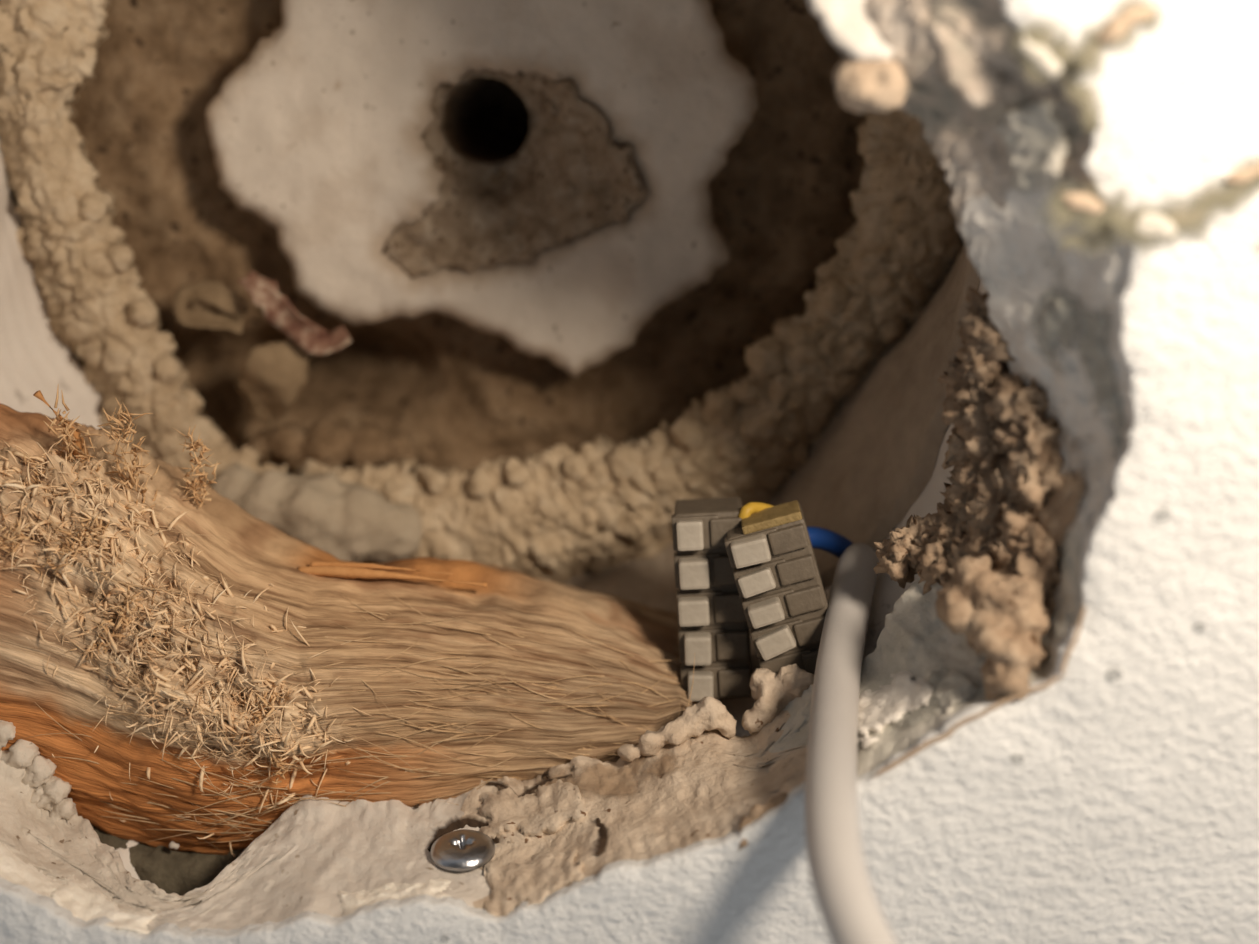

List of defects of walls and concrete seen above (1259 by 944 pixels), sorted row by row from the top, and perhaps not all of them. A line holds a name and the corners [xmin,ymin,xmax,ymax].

crack [1016,1,1159,130]
spalling [382,69,647,278]
crack [1050,161,1259,253]
spalling [807,0,1133,777]
spalling [0,664,814,934]